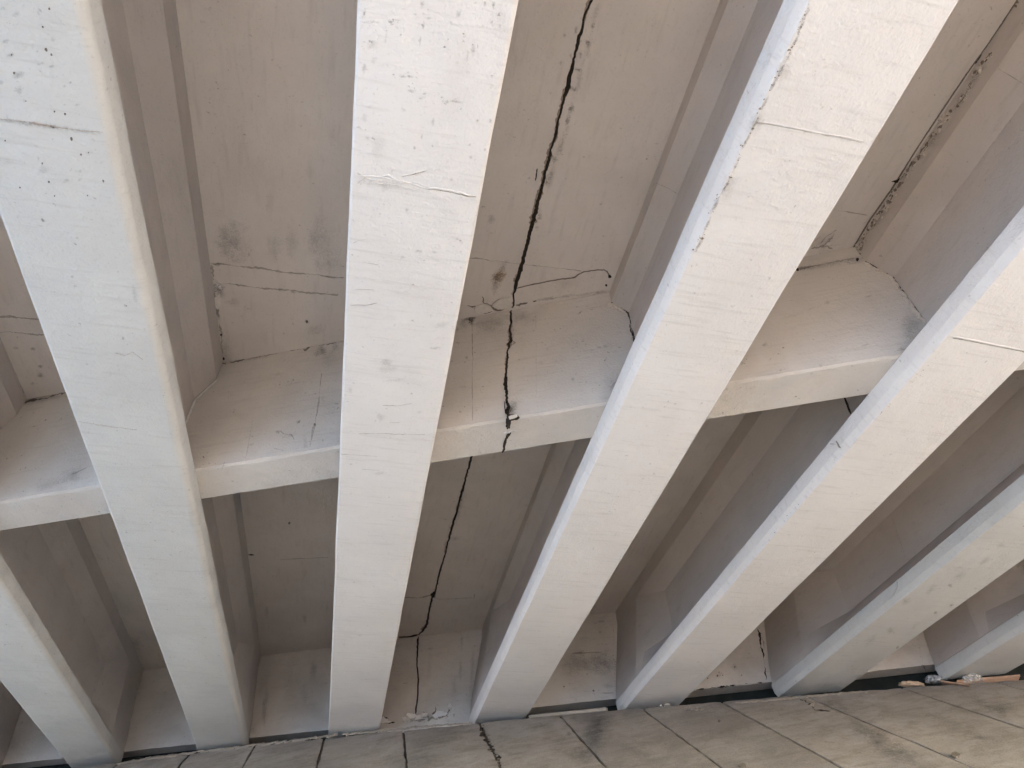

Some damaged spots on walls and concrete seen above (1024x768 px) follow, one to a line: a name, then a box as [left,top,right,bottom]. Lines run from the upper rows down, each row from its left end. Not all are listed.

crack [356,170,476,197]
crack [472,0,612,453]
crack [399,456,475,714]
crack [479,724,502,766]